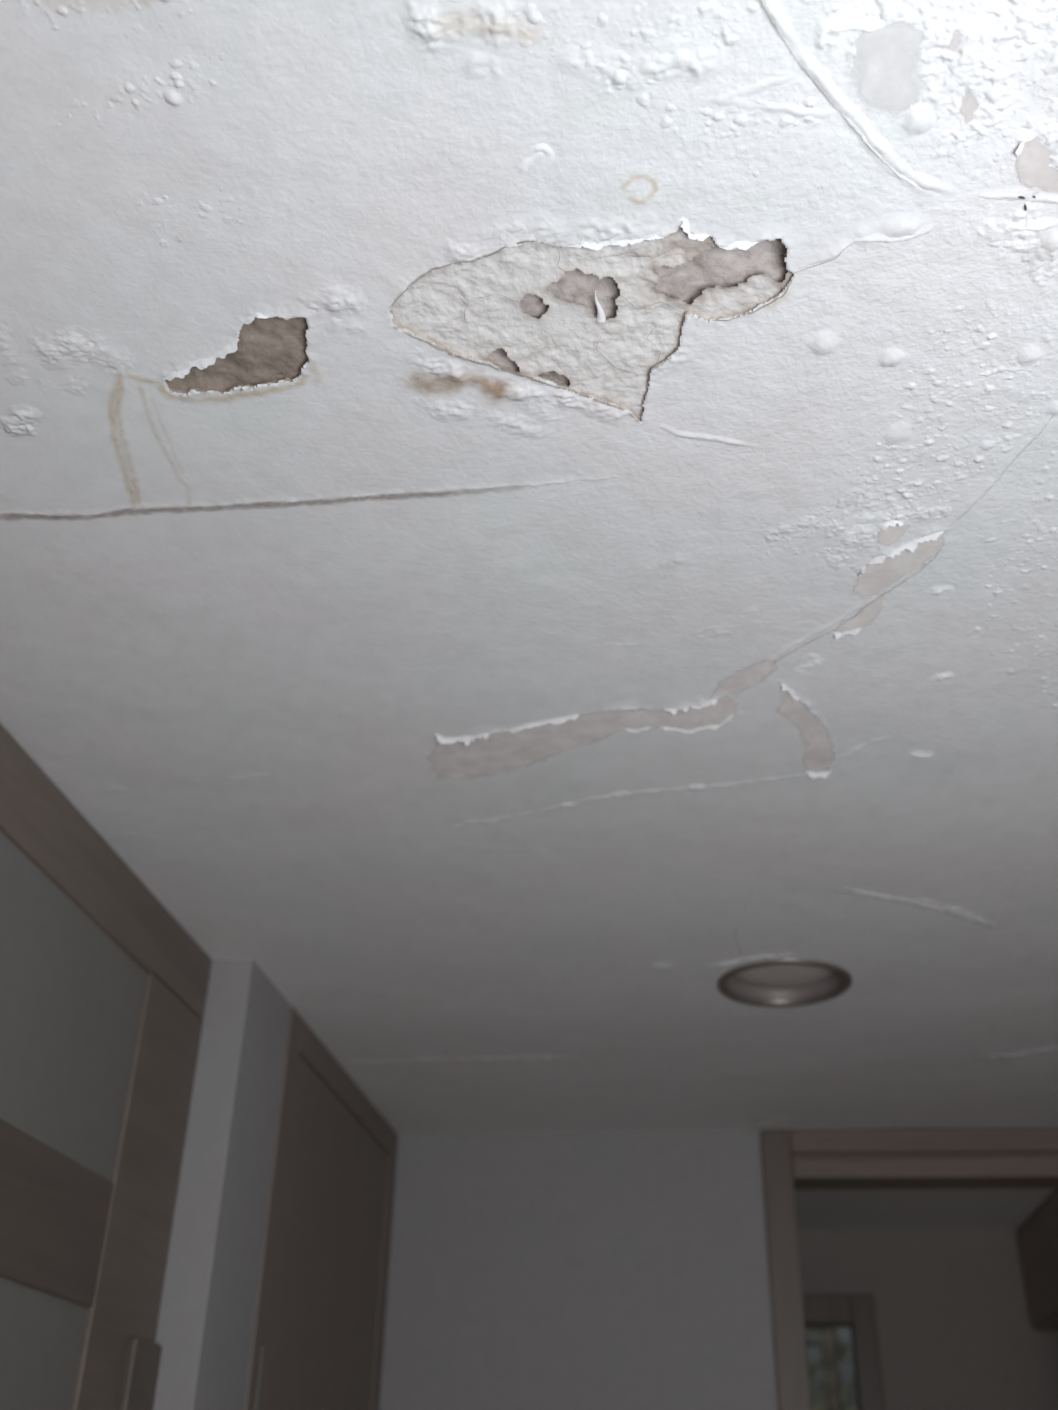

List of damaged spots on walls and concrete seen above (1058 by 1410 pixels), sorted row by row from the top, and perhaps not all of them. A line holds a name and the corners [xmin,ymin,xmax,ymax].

peeling [794,0,1058,295]
peeling [150,300,324,405]
spalling [378,212,807,428]
crack [0,472,624,519]
peeling [827,510,958,639]
peeling [427,691,747,779]